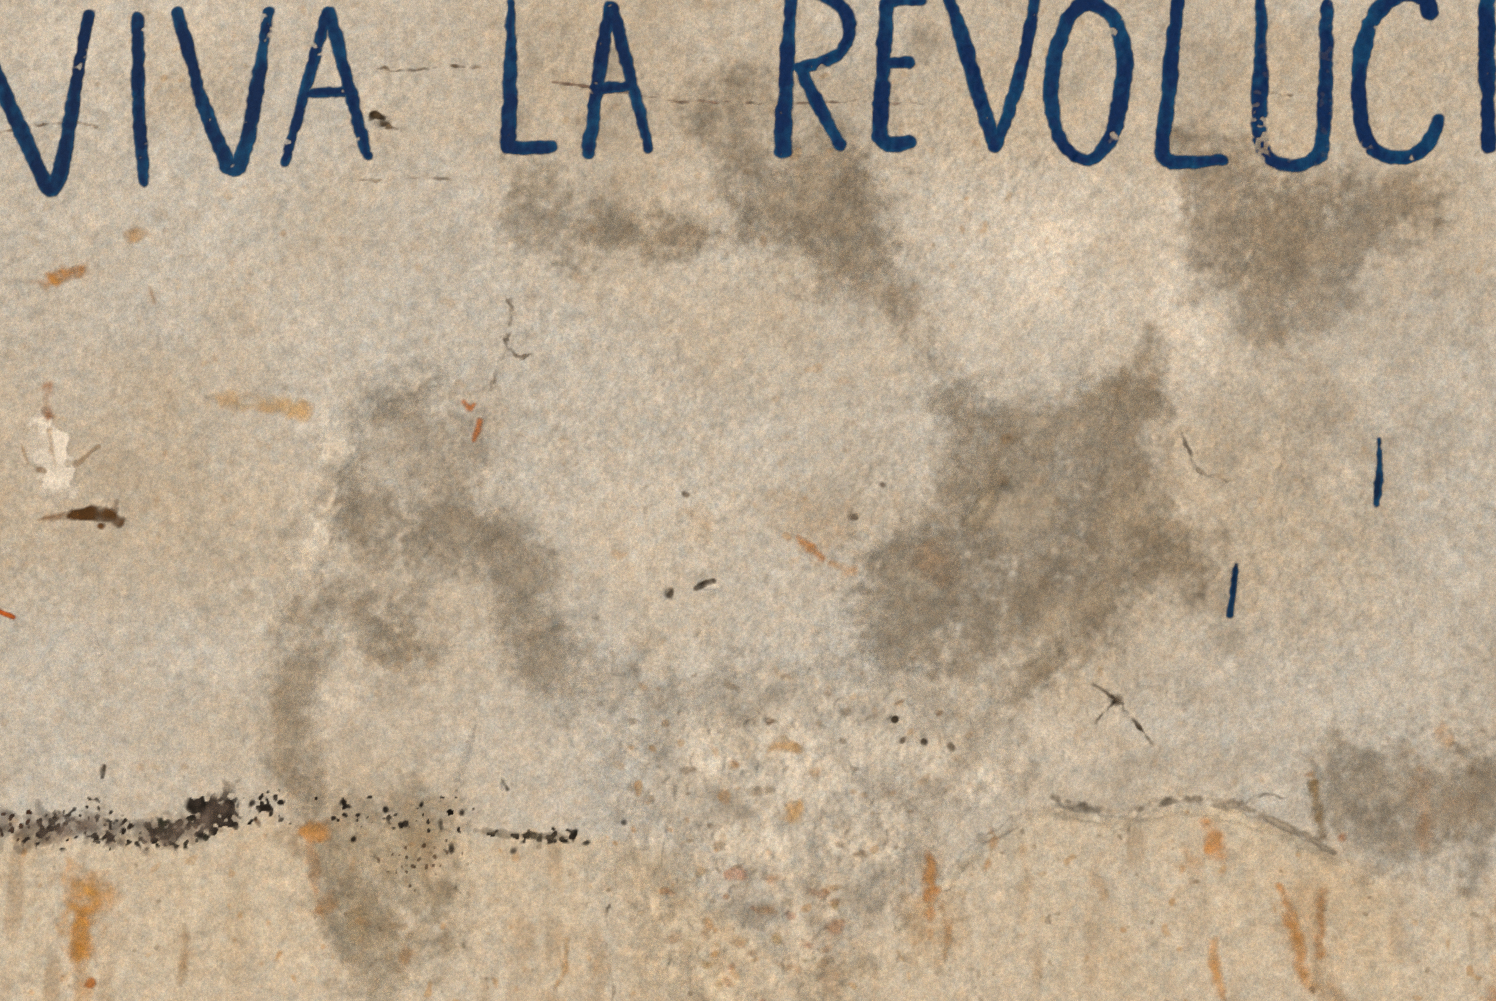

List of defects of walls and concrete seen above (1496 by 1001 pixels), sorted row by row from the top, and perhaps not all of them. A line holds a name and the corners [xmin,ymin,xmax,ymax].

water stain [1169,131,1442,346]
peeling [27,411,81,503]
water stain [339,476,577,686]
water stain [854,352,1207,696]
corrosion [69,881,100,961]
water stain [0,596,432,850]
water stain [311,796,474,972]
water stain [487,828,589,853]
crack [1053,797,1100,811]
crack [1099,690,1149,740]
crack [1138,796,1335,855]
water stain [1310,731,1496,894]